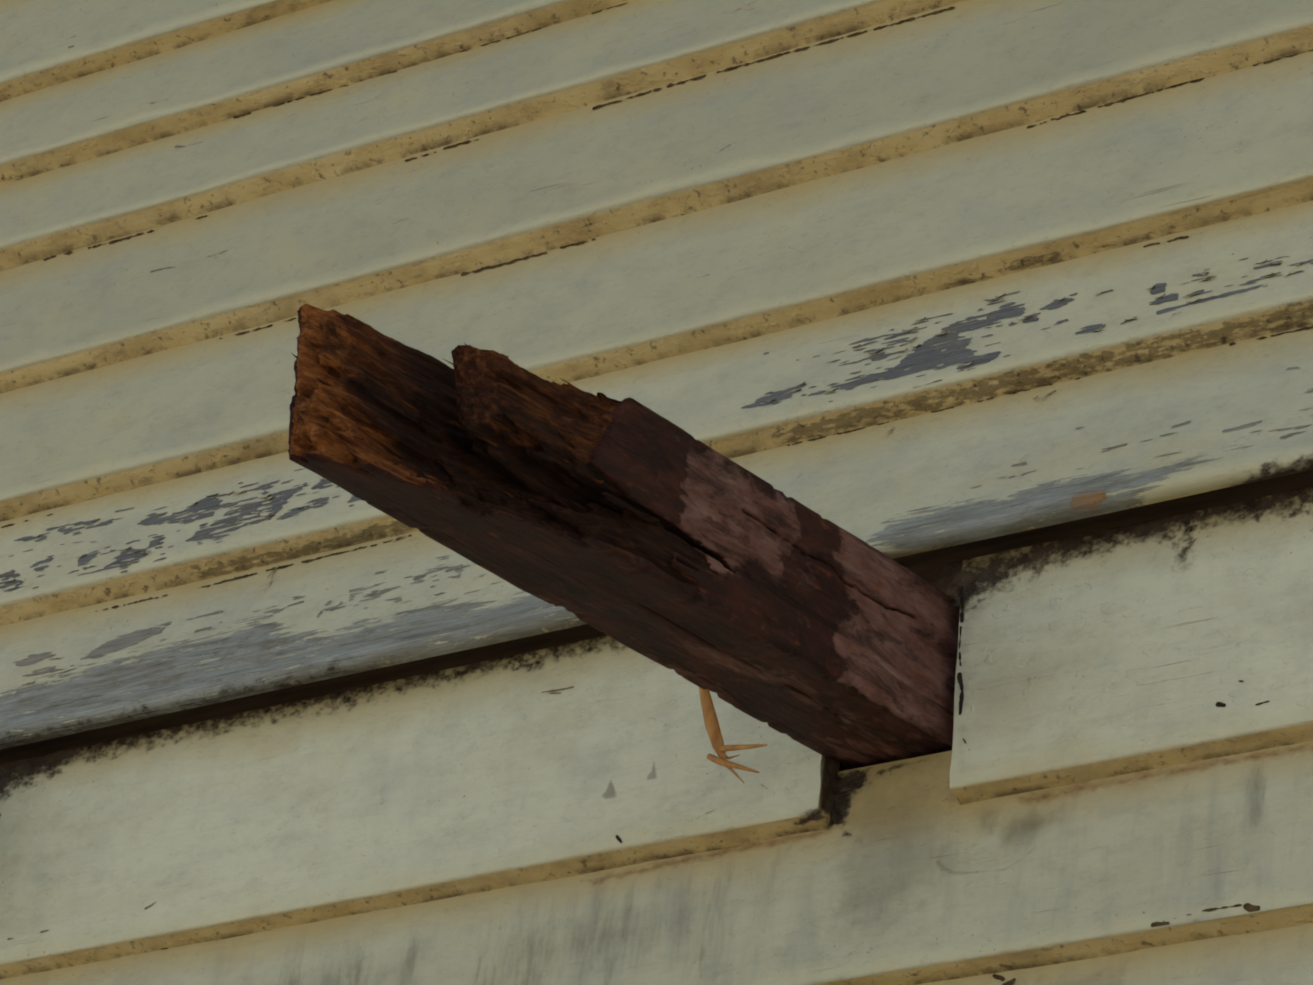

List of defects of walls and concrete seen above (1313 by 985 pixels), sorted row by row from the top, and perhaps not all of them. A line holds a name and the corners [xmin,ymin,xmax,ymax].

peeling [1148,256,1313,315]
peeling [741,291,1138,408]
peeling [1102,420,1191,452]
peeling [1222,388,1313,450]
peeling [0,468,361,592]
peeling [866,452,1219,549]
damp [939,486,1313,615]
peeling [0,555,586,749]
damp [0,635,623,797]